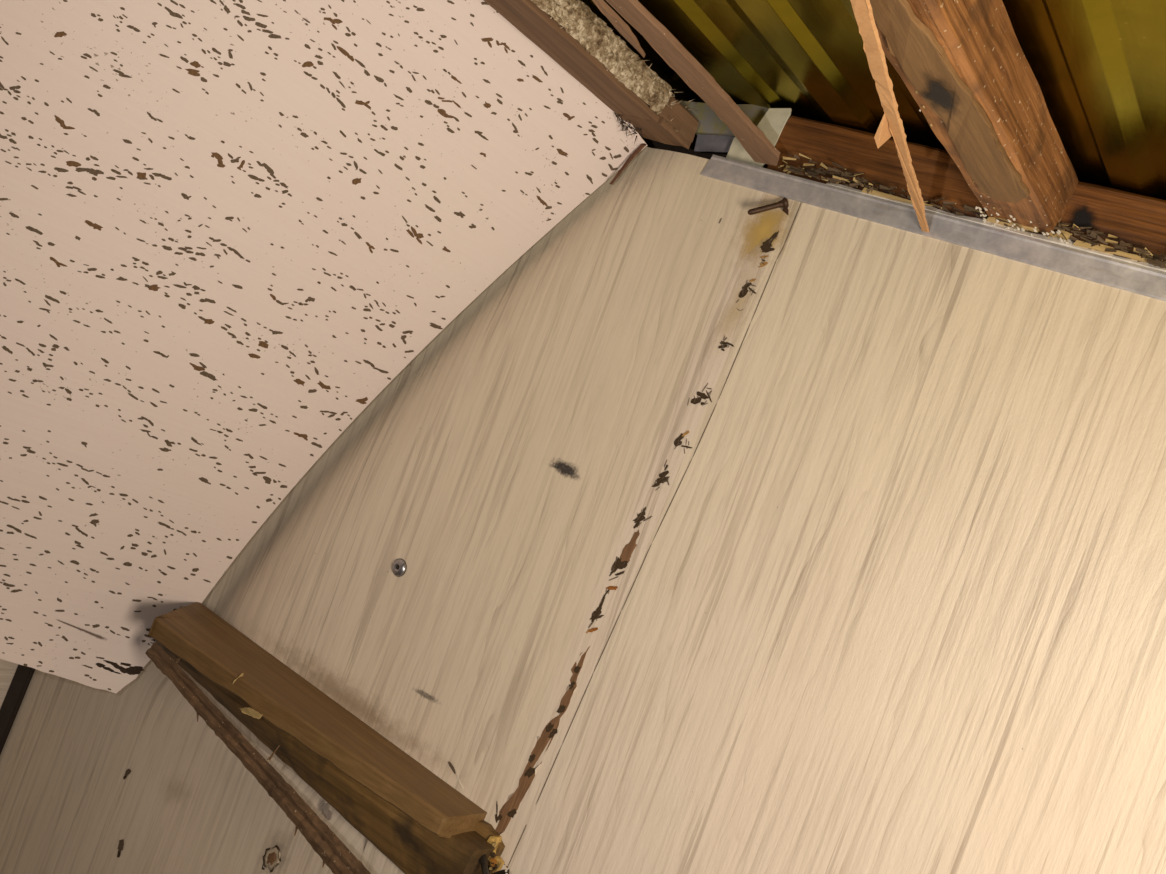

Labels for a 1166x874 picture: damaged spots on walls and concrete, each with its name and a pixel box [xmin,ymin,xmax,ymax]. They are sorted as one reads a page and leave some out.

crack [508,202,802,866]
leakage [746,211,783,255]